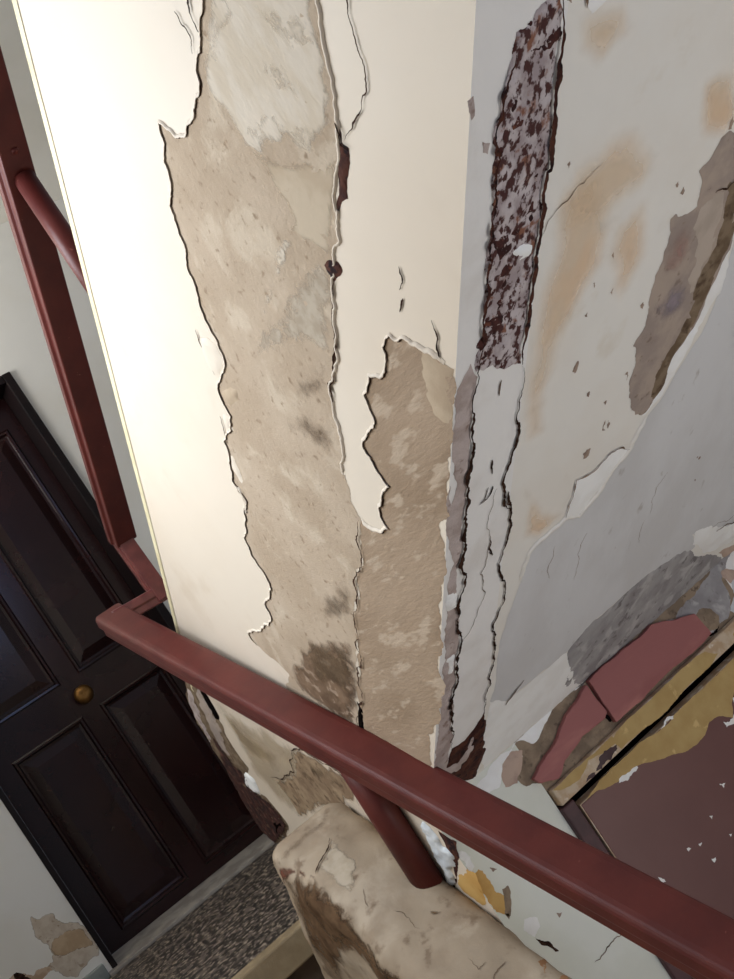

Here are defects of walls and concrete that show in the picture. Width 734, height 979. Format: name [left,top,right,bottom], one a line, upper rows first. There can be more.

corrosion [474,0,566,373]
peeling [157,0,478,770]
crack [327,283,337,402]
peeling [476,117,734,802]
crack [448,362,525,745]
crack [352,520,364,729]
peeling [275,748,358,816]
peeling [315,838,355,890]
peeling [420,821,512,919]
peeling [10,913,99,979]
peeling [524,917,559,952]